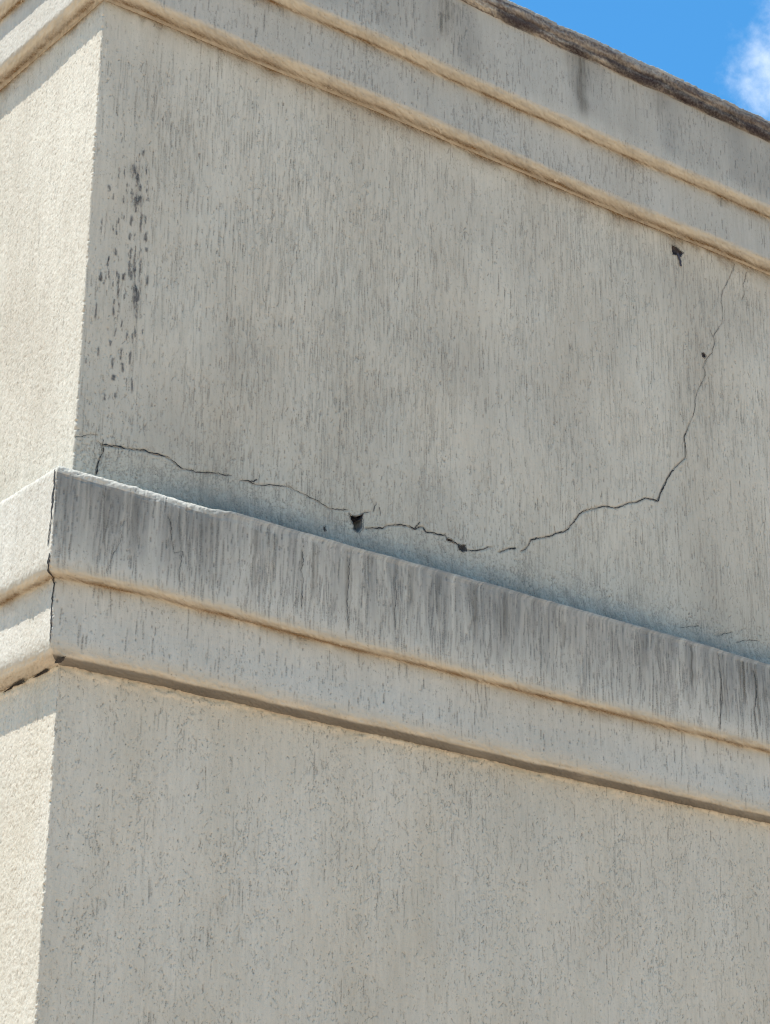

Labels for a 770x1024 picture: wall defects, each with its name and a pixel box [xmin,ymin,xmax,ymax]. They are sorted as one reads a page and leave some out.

water stain [0,2,94,91]
water stain [119,2,768,271]
water stain [100,151,148,339]
crack [75,272,747,552]
spalling [349,513,364,533]
water stain [204,610,367,653]
water stain [491,683,646,723]